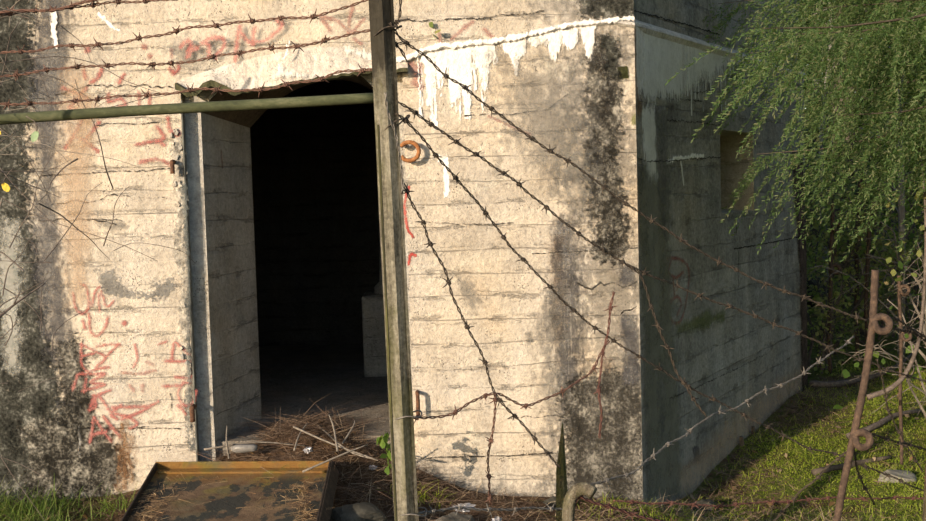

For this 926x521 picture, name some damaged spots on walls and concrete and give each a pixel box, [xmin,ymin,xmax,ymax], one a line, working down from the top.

water stain [0,0,136,503]
water stain [396,0,754,506]